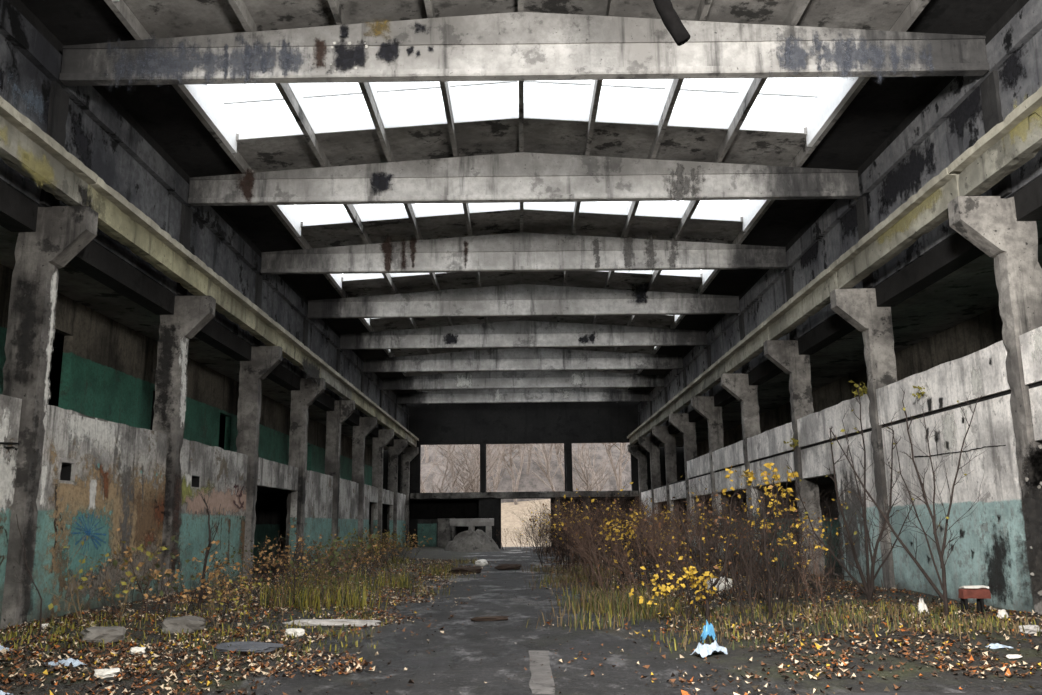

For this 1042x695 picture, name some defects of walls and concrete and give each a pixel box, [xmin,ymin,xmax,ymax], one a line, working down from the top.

water stain [105,36,433,86]
water stain [0,409,18,511]
water stain [20,463,38,616]
peeling [44,444,166,617]
water stain [983,442,1042,607]